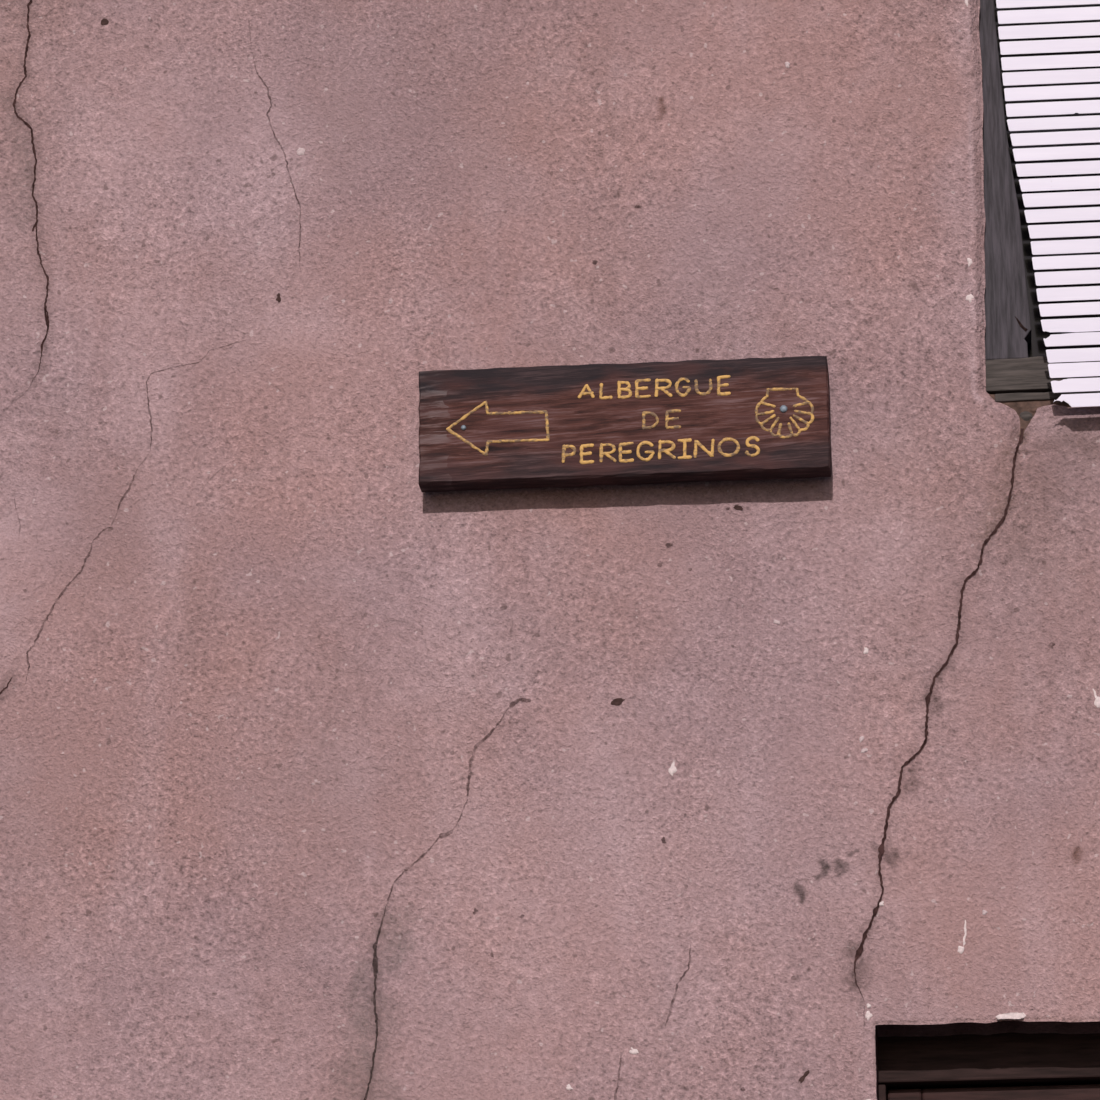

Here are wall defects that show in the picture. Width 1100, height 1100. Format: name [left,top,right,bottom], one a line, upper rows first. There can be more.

crack [12,0,49,386]
crack [146,343,234,449]
crack [0,530,104,694]
crack [483,698,531,740]
crack [854,428,1024,1000]
crack [364,764,471,1100]